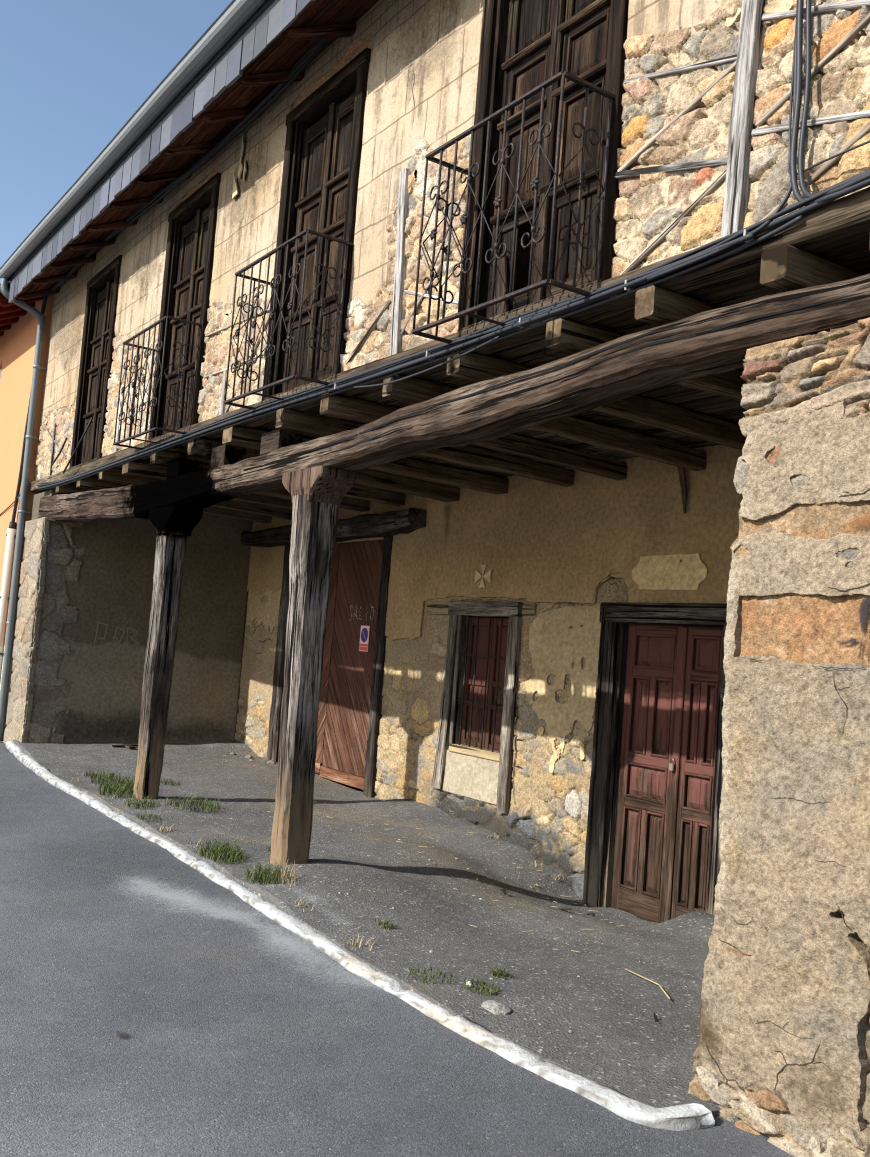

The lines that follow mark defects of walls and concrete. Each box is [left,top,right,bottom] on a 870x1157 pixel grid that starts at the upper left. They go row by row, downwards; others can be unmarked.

flaking render [611,0,742,278]
flaking render [743,0,870,229]
flaking render [340,136,471,372]
flaking render [198,296,271,423]
peeling [525,606,601,775]
crack [706,1045,742,1090]
crack [755,1020,830,1090]